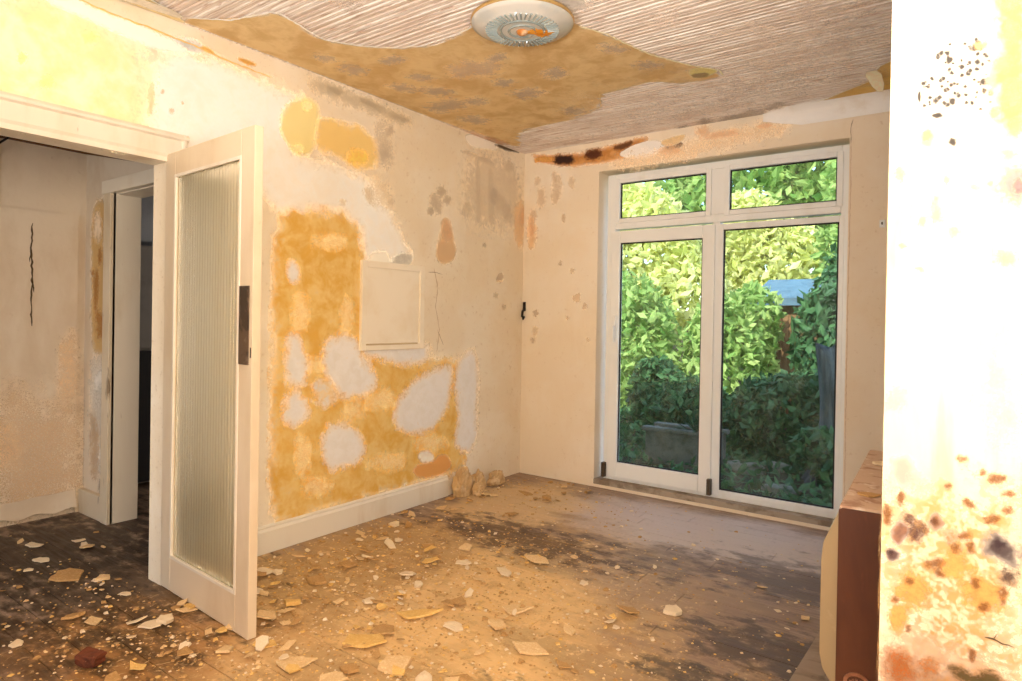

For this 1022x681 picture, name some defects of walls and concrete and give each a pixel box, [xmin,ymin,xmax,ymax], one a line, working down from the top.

leakage [918,0,1022,147]
leakage [970,150,1022,209]
crack [27,223,35,325]
peeling [0,0,724,522]
leakage [878,457,1022,681]